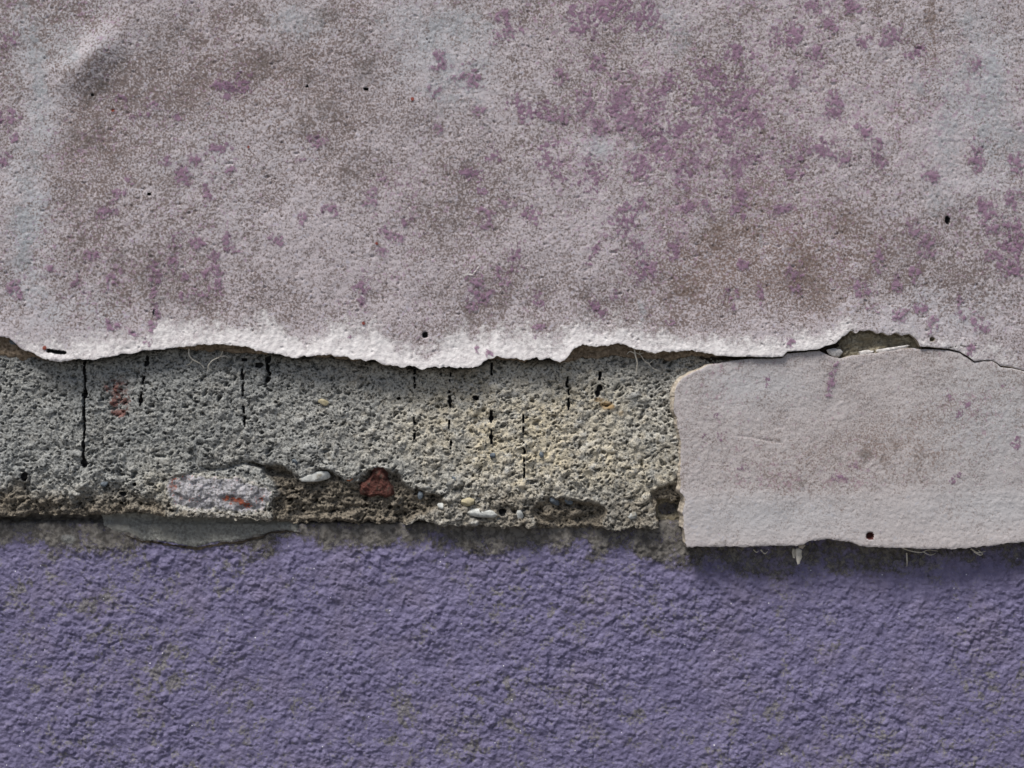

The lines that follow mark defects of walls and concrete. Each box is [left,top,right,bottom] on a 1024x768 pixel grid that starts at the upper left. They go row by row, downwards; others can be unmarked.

peeling [297,204,344,228]
peeling [458,146,540,230]
peeling [585,197,680,286]
crack [700,329,854,367]
crack [921,345,1024,371]
crack [47,348,88,468]
spalling [0,231,1024,581]